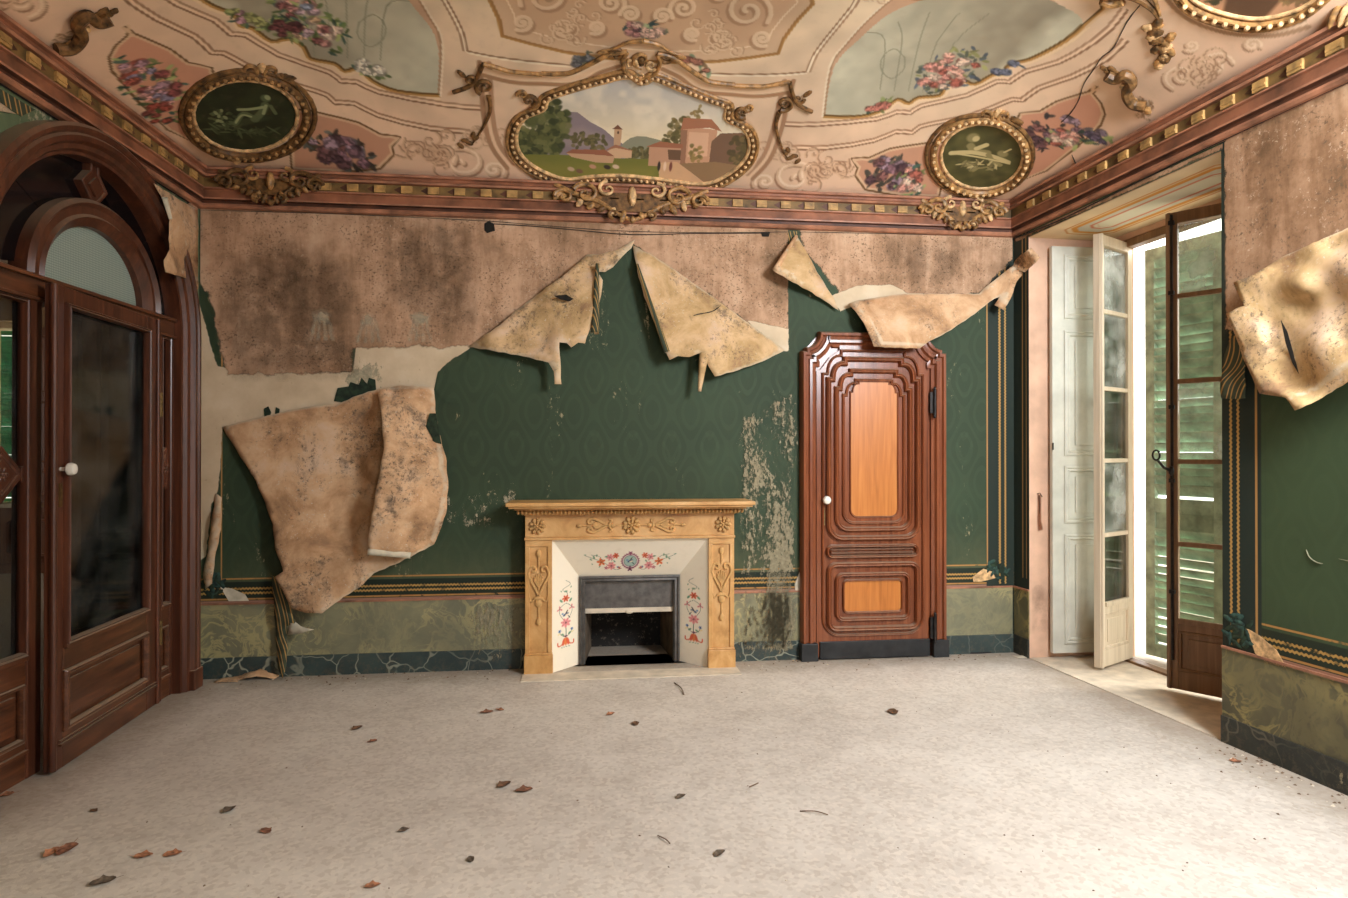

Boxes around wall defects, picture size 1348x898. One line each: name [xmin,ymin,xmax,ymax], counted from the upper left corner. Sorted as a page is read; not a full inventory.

flaking render [187,84,1348,589]